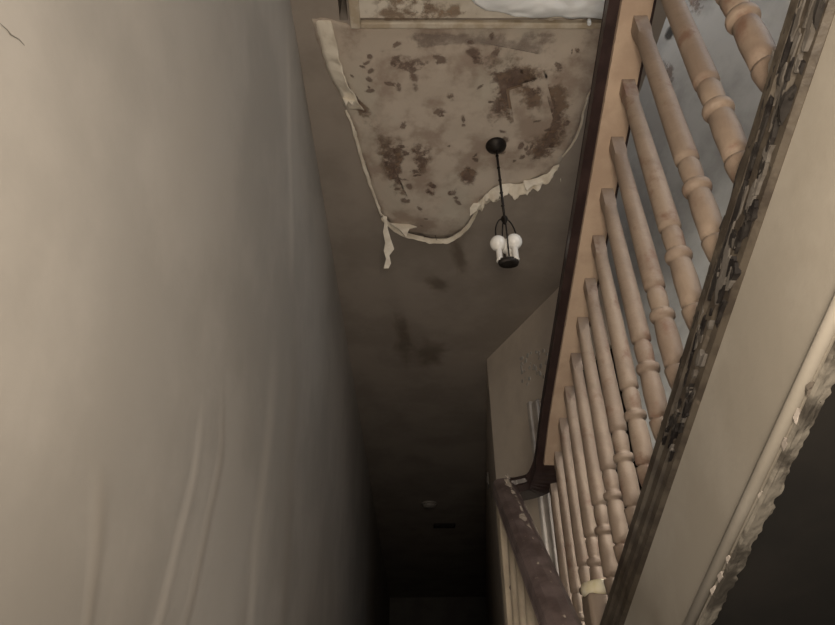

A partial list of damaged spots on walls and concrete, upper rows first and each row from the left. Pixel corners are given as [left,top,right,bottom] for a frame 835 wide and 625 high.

leakage [380,0,416,20]
leakage [425,5,461,18]
peeling [312,18,600,269]
flaking render [698,341,835,625]